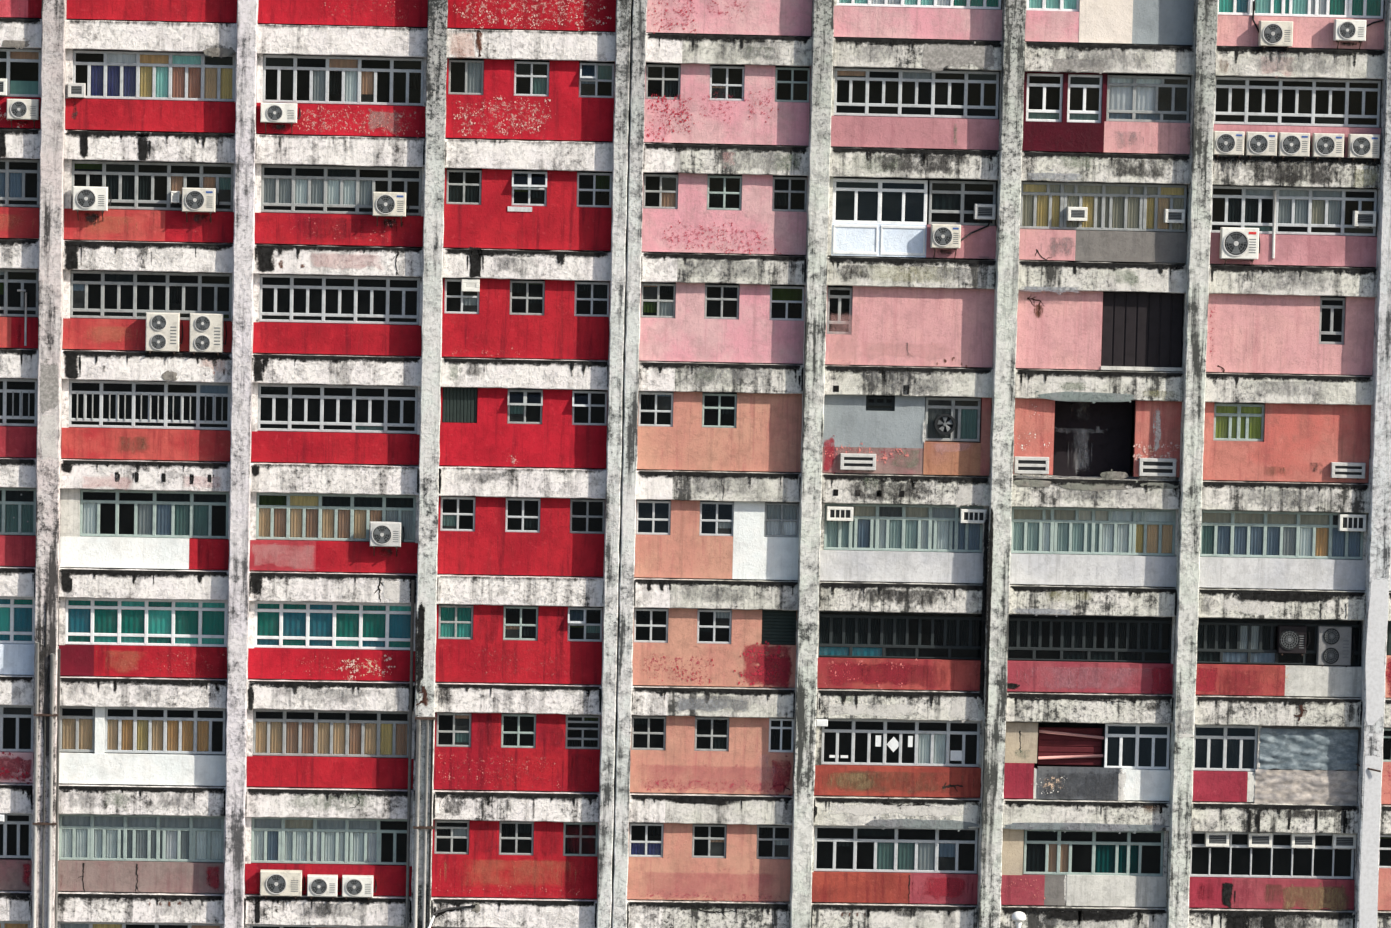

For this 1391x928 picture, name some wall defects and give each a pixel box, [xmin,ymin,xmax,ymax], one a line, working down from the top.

peeling [453,0,611,31]
peeling [298,103,423,139]
peeling [454,95,551,136]
peeling [644,88,779,141]
damp [0,239,39,259]
damp [1011,586,1177,616]
peeling [305,654,395,681]
damp [1007,683,1174,721]
peeling [0,751,32,784]
damp [1189,882,1355,928]